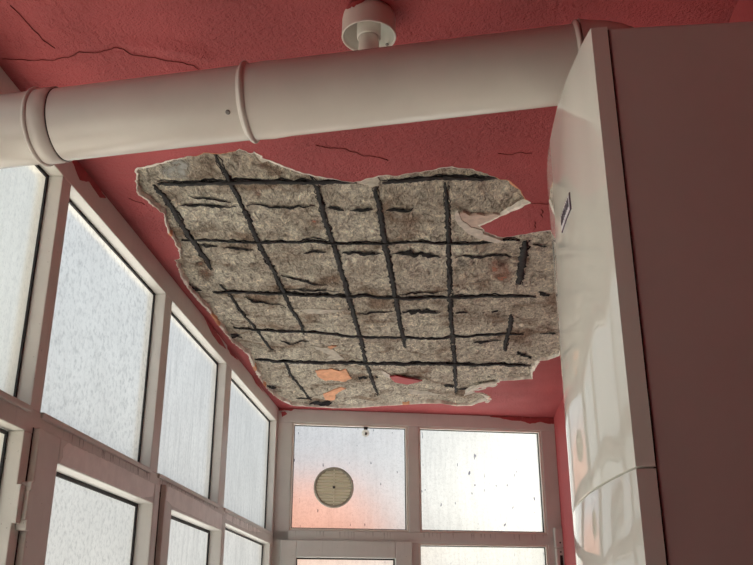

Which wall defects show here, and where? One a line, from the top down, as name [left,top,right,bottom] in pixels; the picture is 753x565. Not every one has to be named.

crack [7,5,199,70]
crack [316,145,388,161]
spalling [135,149,560,417]